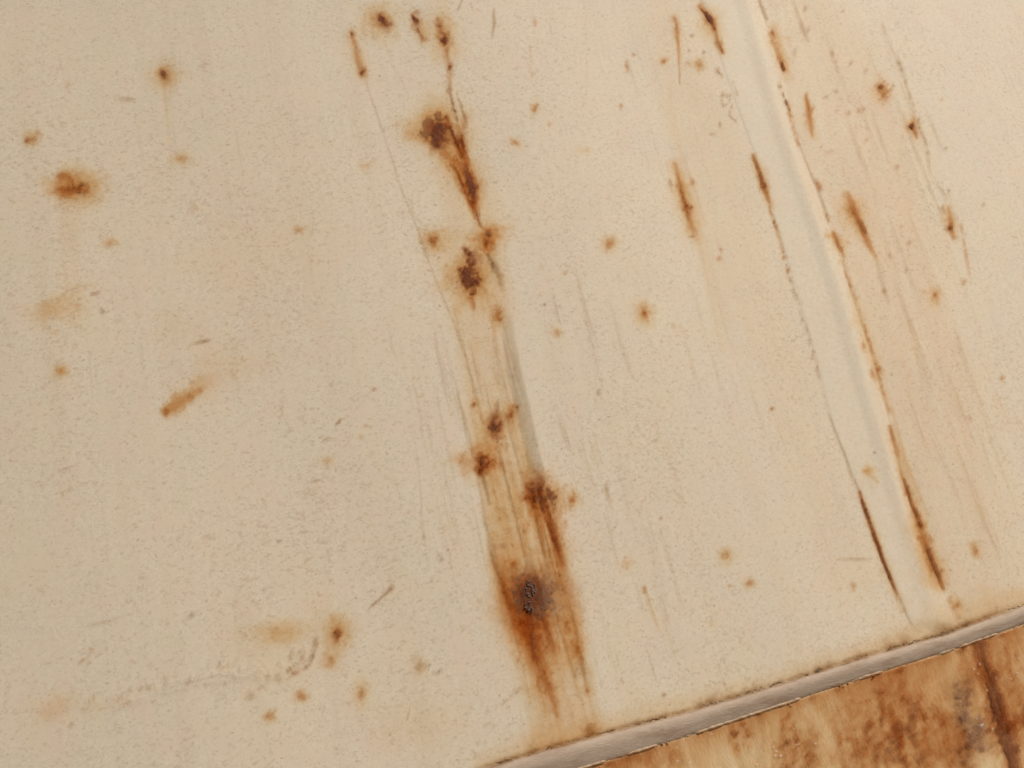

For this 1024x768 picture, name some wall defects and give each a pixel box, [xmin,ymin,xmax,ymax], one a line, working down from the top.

rust [420,111,464,148]
rust [460,248,482,294]
rust [533,486,557,516]
rust [514,577,554,615]
rust [957,640,1020,768]